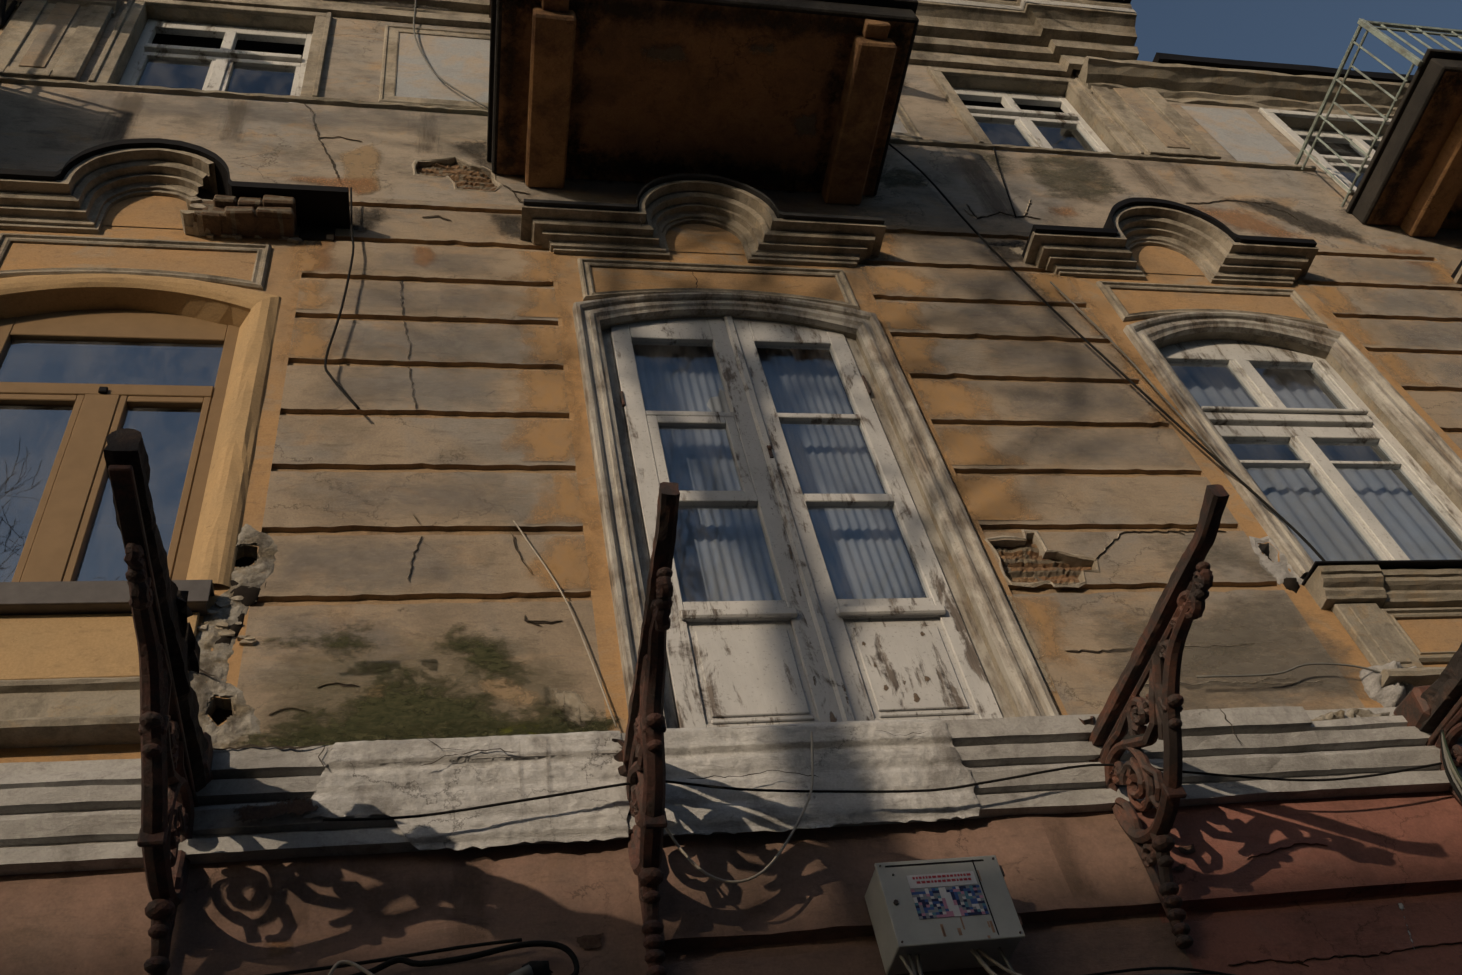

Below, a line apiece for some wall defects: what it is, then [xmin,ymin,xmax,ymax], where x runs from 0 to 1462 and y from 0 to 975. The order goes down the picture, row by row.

crack [303,102,362,185]
spalling [411,156,503,192]
spalling [180,194,336,244]
spalling [1249,536,1300,593]
spalling [188,524,279,749]
spalling [985,530,1100,691]
crack [1248,843,1328,859]